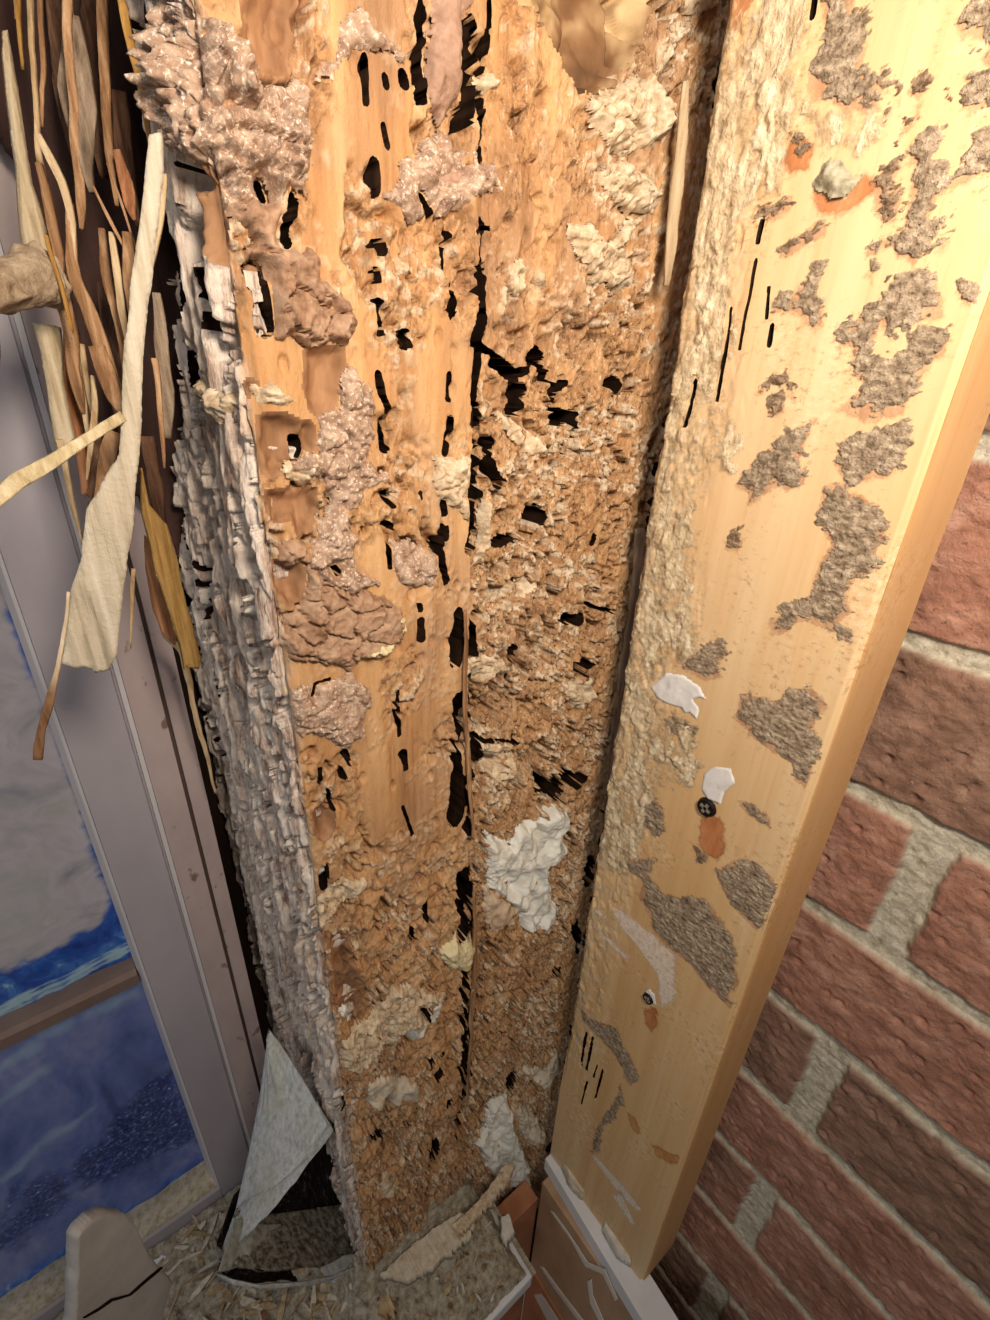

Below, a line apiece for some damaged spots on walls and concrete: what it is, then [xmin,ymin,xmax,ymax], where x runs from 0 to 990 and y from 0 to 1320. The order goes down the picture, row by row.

crack [809,0,818,21]
leakage [808,39,889,116]
leakage [957,21,990,65]
leakage [871,152,977,238]
leakage [867,239,917,265]
crack [682,219,775,428]
leakage [770,530,884,640]
leakage [737,690,827,787]
rust [699,816,725,858]
crack [581,1032,604,1104]